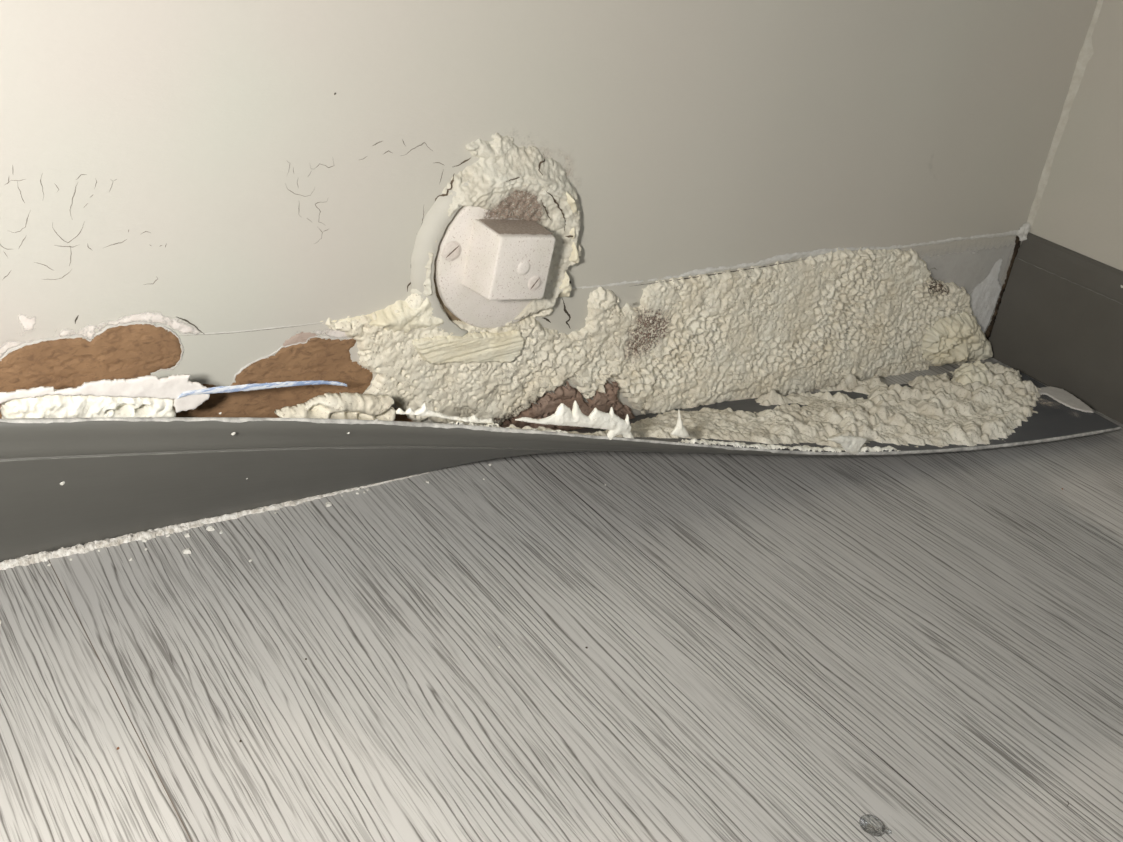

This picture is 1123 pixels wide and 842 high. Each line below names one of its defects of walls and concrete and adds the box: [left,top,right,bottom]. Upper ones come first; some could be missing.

crack [0,165,167,280]
crack [287,139,470,240]